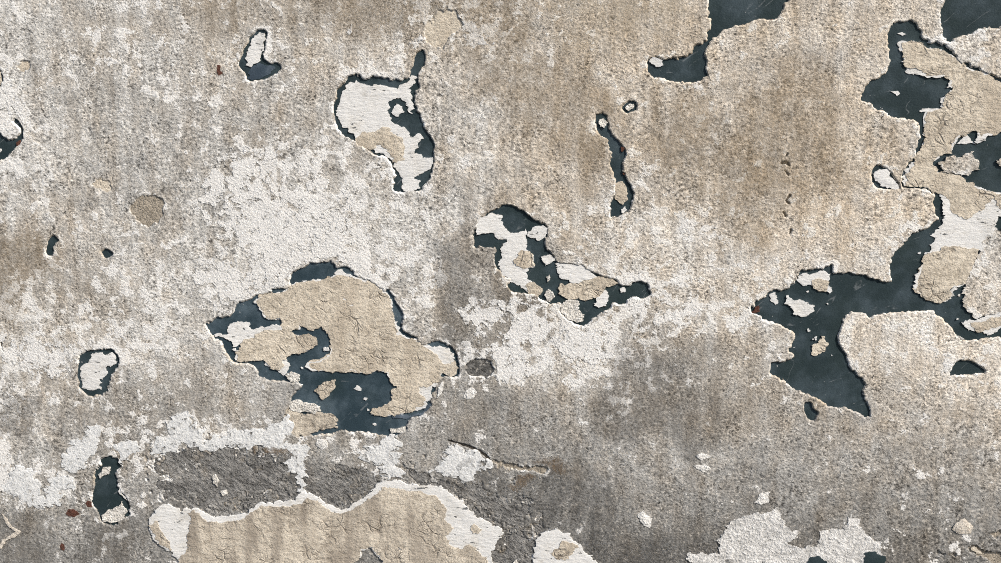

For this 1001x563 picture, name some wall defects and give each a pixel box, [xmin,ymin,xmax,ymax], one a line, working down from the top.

peeling [0,119,23,160]
peeling [239,30,281,81]
peeling [334,50,435,192]
peeling [595,113,634,217]
peeling [622,101,637,113]
peeling [647,0,788,83]
peeling [751,0,1001,420]
peeling [473,205,651,326]
peeling [77,349,119,397]
peeling [205,261,494,450]
flaking render [92,443,598,563]
peeling [686,492,886,563]